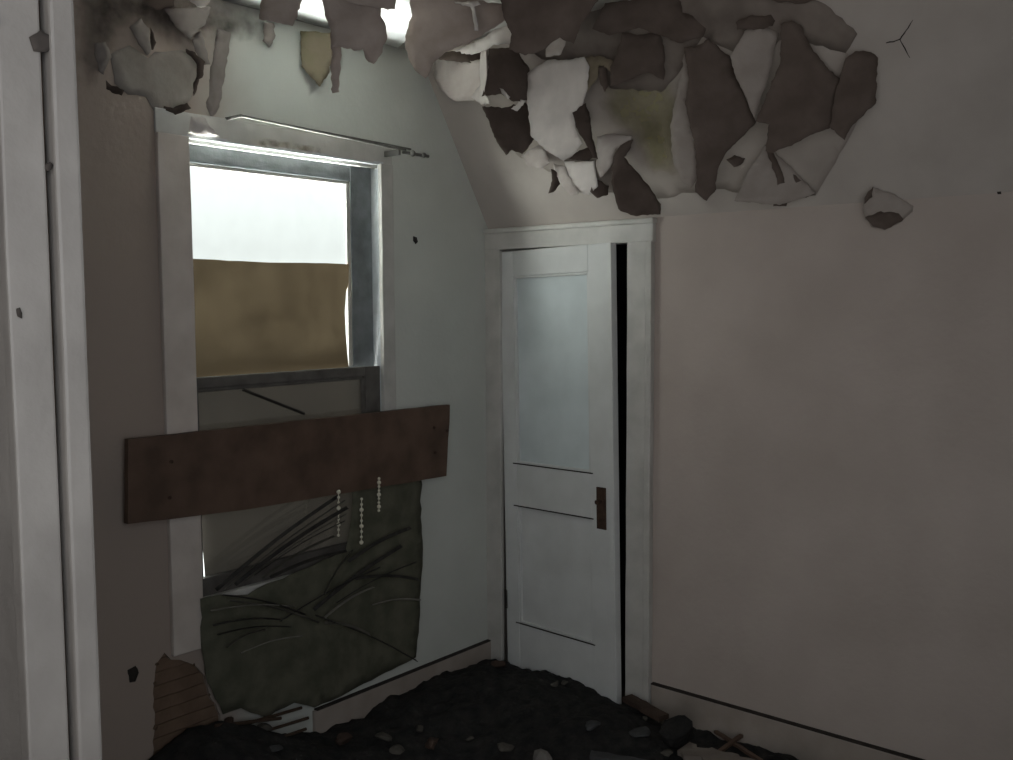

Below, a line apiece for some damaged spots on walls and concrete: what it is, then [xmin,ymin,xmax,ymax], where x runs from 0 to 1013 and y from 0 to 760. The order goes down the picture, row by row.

peeling [94,0,231,137]
peeling [222,0,878,216]
crack [886,20,913,58]
peeling [863,187,913,230]